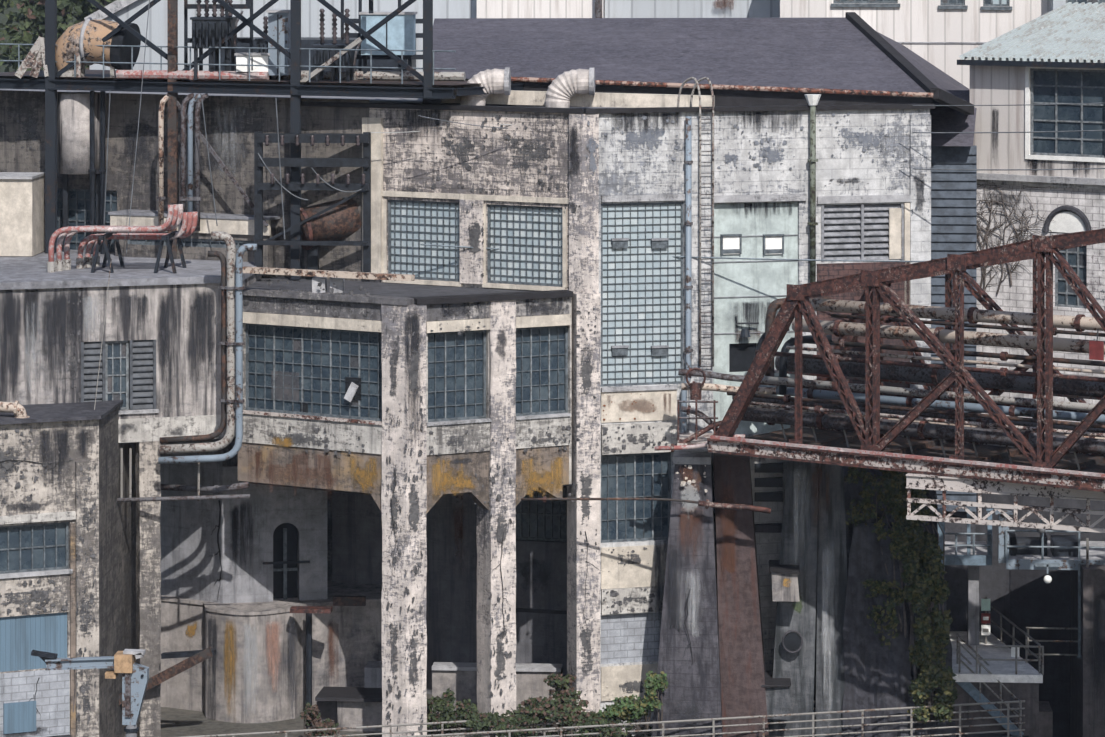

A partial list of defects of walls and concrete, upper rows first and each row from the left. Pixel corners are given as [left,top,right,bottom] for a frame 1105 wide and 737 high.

peeling [819,113,908,162]
peeling [427,113,580,254]
damp [1,290,82,381]
damp [112,295,146,324]
damp [160,296,175,370]
damp [188,292,215,374]
peeling [244,279,373,321]
damp [7,429,89,511]
peeling [245,426,367,456]
crack [211,500,222,600]
peeling [386,308,672,736]